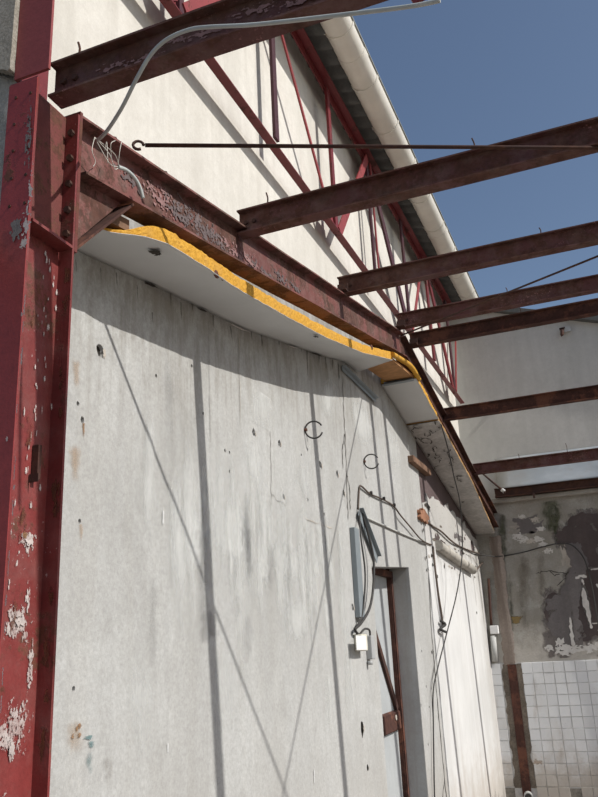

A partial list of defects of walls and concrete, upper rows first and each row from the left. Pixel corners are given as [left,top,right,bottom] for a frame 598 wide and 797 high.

peeling [8,532,37,569]
peeling [507,509,598,658]
peeling [0,579,34,762]